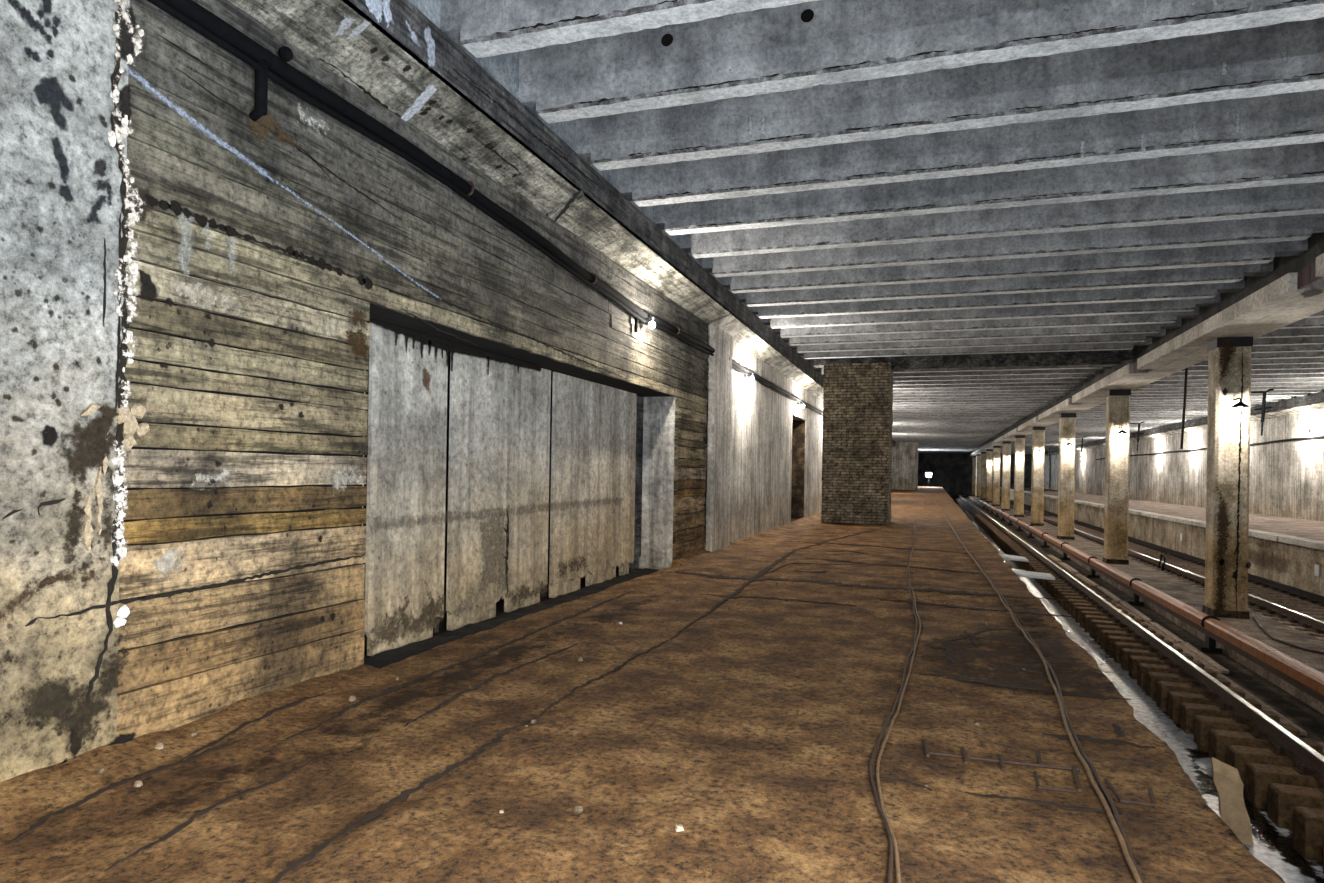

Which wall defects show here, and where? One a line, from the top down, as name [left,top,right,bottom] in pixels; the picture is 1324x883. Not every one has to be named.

water stain [42,0,52,15]
water stain [34,77,74,202]
water stain [87,159,113,224]
crack [5,591,633,872]